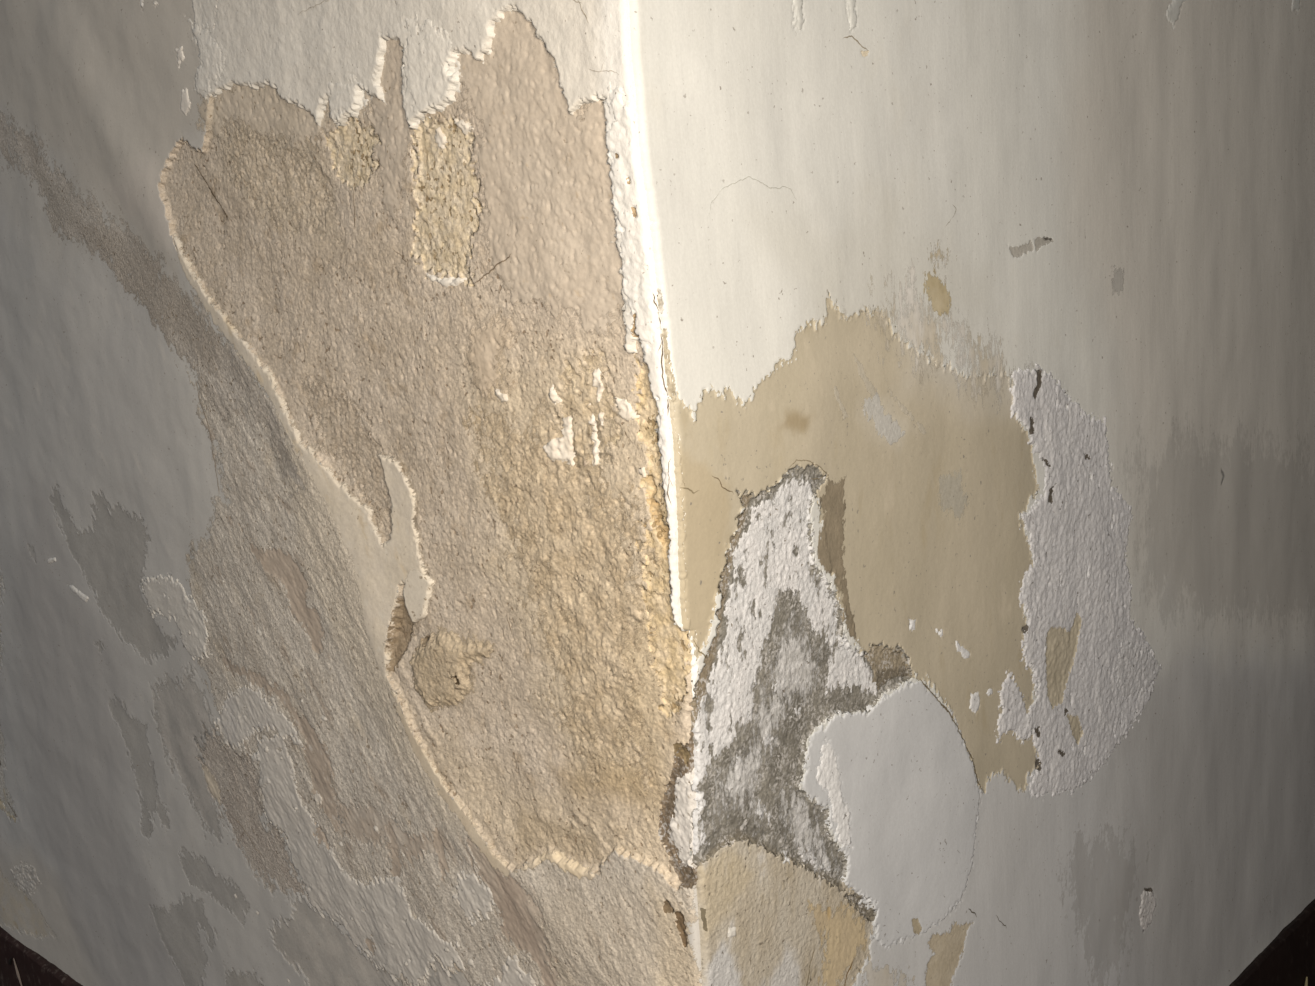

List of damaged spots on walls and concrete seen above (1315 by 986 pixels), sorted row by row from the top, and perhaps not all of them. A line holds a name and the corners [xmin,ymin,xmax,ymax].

peeling [49,484,178,665]
peeling [109,695,170,838]
leakage [0,103,308,499]
spalling [140,0,1162,986]